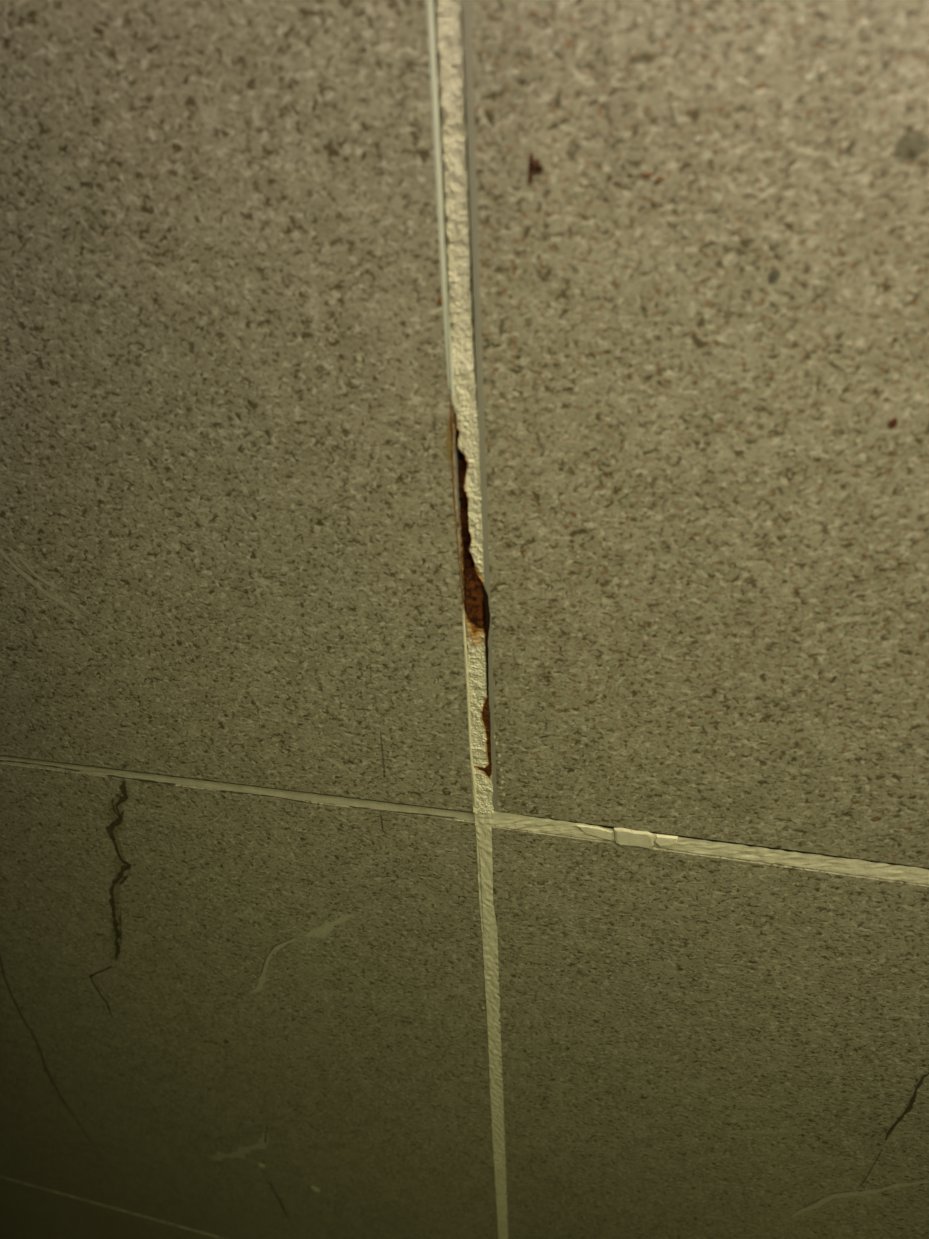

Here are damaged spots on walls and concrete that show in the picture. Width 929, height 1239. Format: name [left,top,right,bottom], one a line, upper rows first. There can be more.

peeling [435,0,494,816]
rust [465,571,492,777]
crack [0,760,176,1020]
crack [219,790,305,802]
crack [349,806,465,824]
crack [886,1073,929,1139]